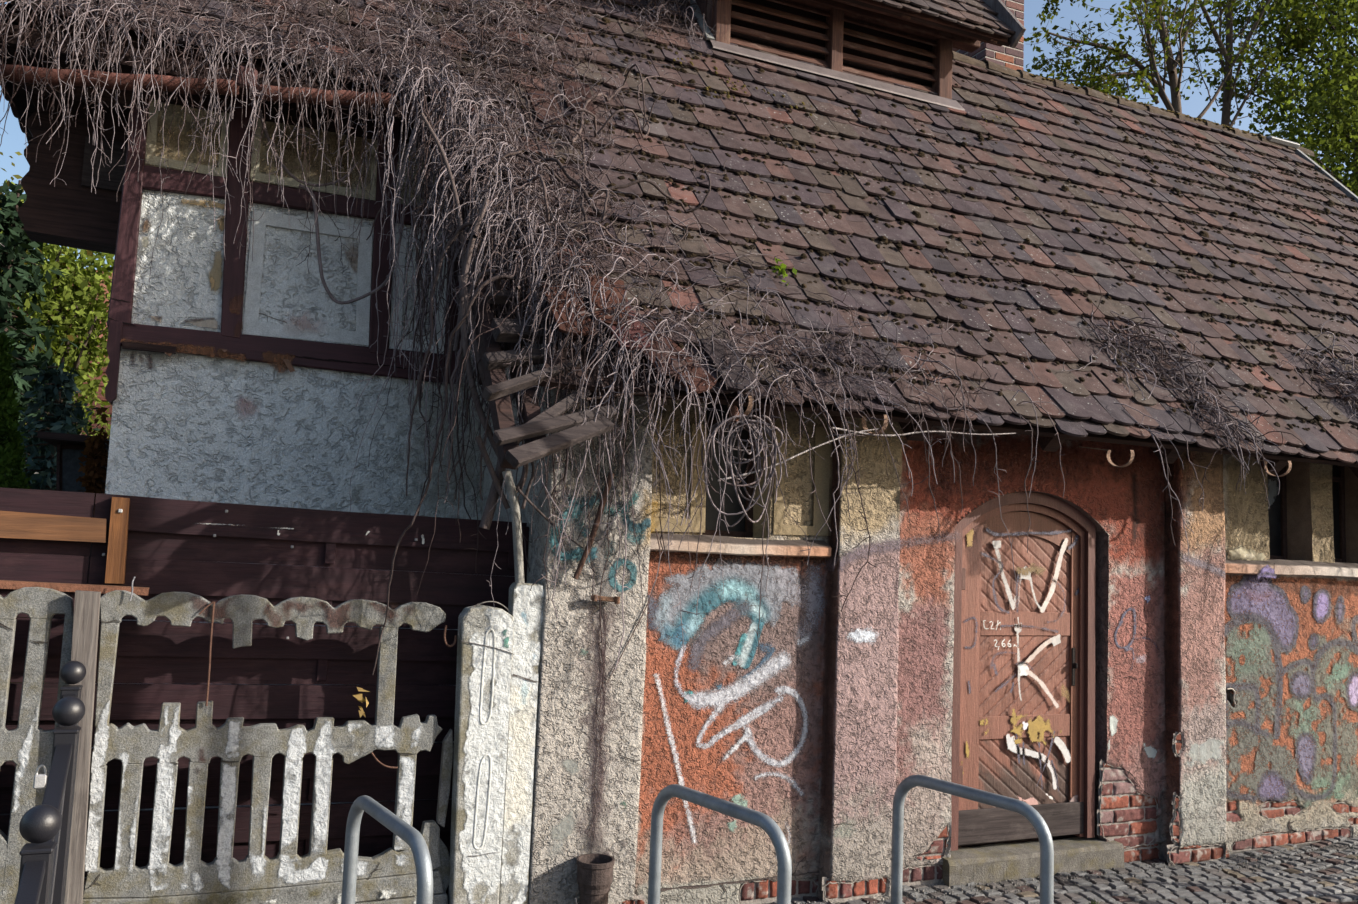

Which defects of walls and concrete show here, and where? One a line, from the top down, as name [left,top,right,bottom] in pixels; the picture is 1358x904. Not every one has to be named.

peeling [209,251,223,291]
peeling [121,339,245,362]
peeling [263,352,295,372]
peeling [85,701,129,873]
peeling [115,706,204,892]
peeling [216,721,242,889]
peeling [250,722,367,895]
peeling [348,723,421,825]
peeling [394,836,407,866]
peeling [459,585,544,904]
flaking render [739,823,949,904]
flaking render [1097,716,1358,866]